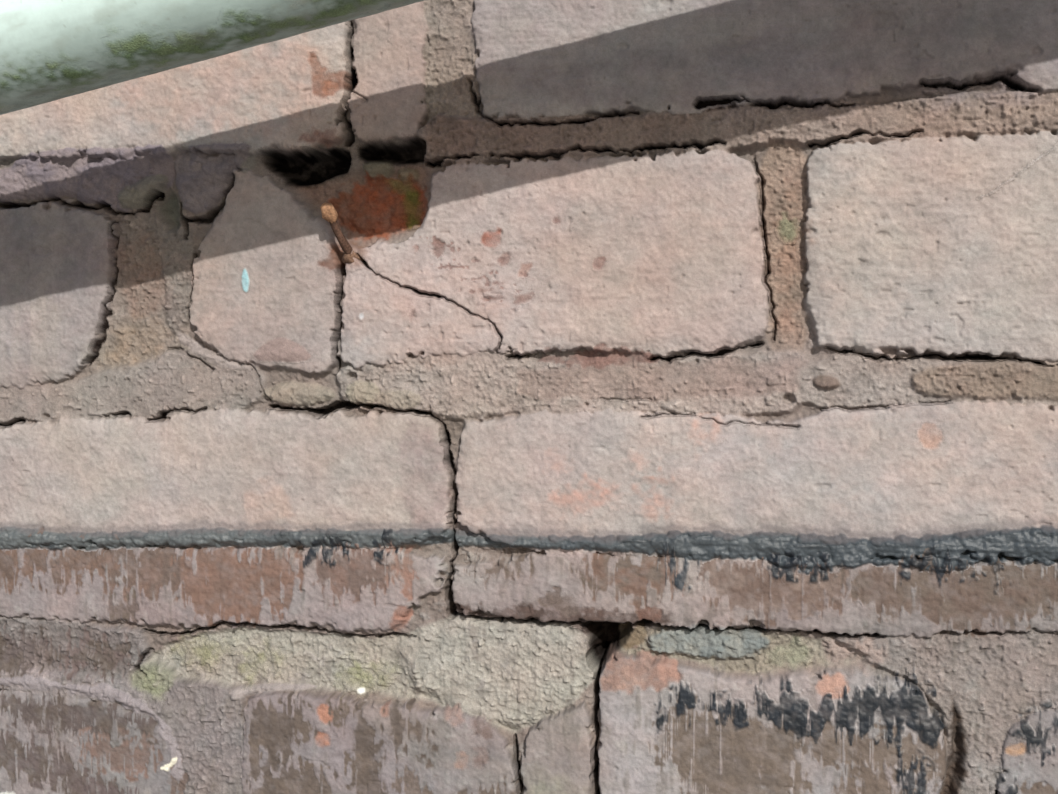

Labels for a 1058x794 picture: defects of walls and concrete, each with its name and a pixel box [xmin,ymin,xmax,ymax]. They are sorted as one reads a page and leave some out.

crack [336,20,368,147]
rust [323,226,378,272]
crack [330,253,503,375]
crack [243,361,459,620]
peeling [0,545,424,794]
crack [512,734,523,794]
crack [586,641,609,794]
water stain [649,680,751,744]
peeling [454,547,1058,794]
water stain [883,747,938,794]